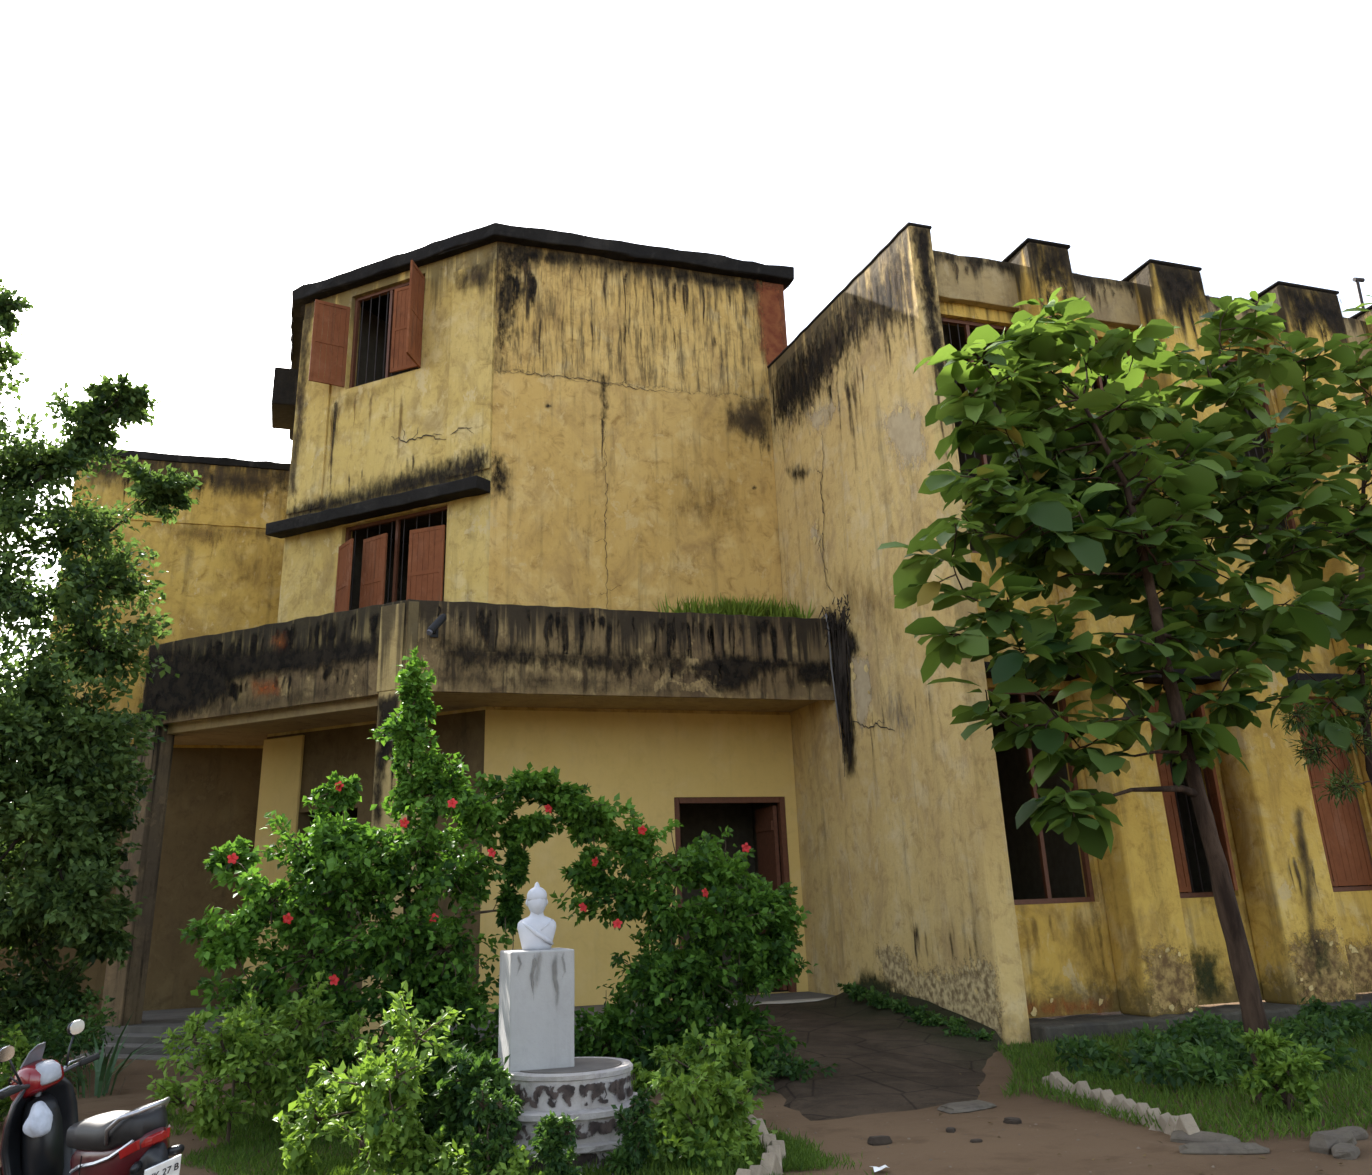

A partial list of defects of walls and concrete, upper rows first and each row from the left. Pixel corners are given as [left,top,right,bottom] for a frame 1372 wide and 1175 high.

water stain [462,245,759,369]
water stain [727,228,1012,451]
water stain [1030,243,1133,324]
water stain [1149,261,1219,346]
water stain [1283,286,1347,343]
water stain [88,305,508,518]
crack [391,422,471,443]
crack [596,427,621,608]
water stain [440,607,859,775]
water stain [1289,810,1318,952]